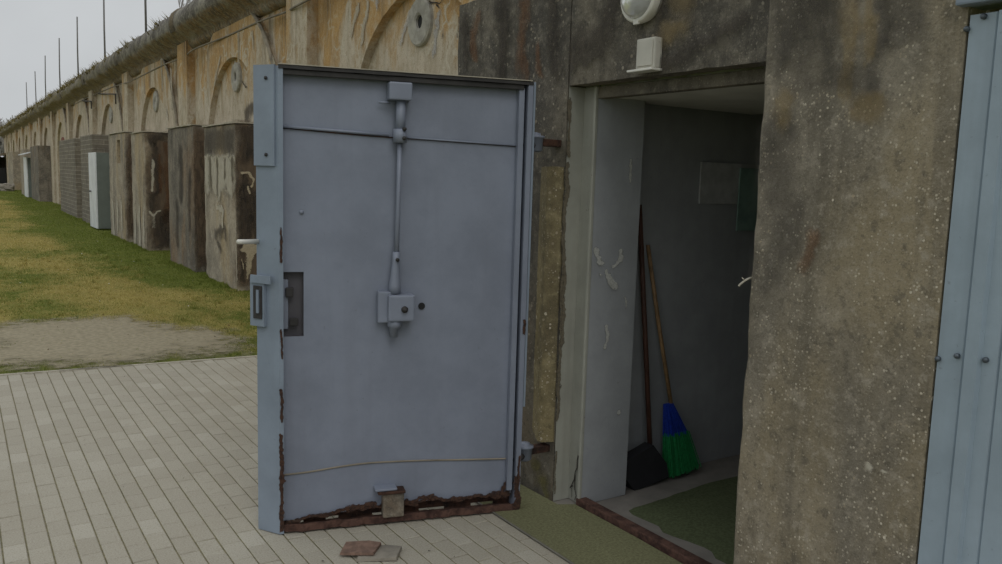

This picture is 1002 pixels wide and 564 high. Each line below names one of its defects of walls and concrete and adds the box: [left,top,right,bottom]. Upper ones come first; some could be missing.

corrosion [279,389,382,532]
corrosion [404,455,521,512]